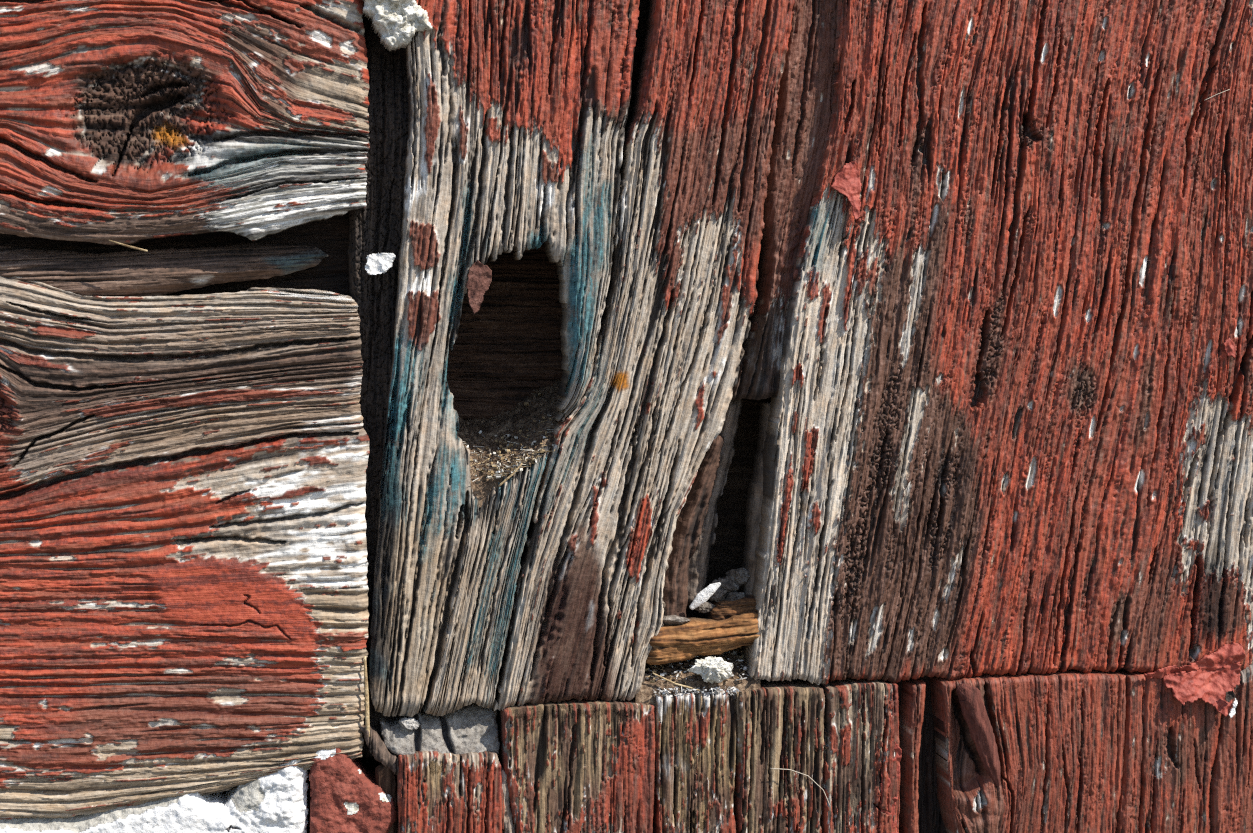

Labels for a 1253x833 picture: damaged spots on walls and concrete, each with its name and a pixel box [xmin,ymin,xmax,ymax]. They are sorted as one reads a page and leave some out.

peeling [900,233,928,366]
peeling [923,158,951,234]
crack [1091,83,1109,186]
crack [1095,62,1161,431]
peeling [0,0,902,833]
crack [862,428,889,583]
peeling [890,373,942,528]
crack [900,480,945,598]
peeling [1163,395,1253,718]
crack [943,483,1085,833]
crack [1106,604,1117,669]
peeling [918,676,948,833]